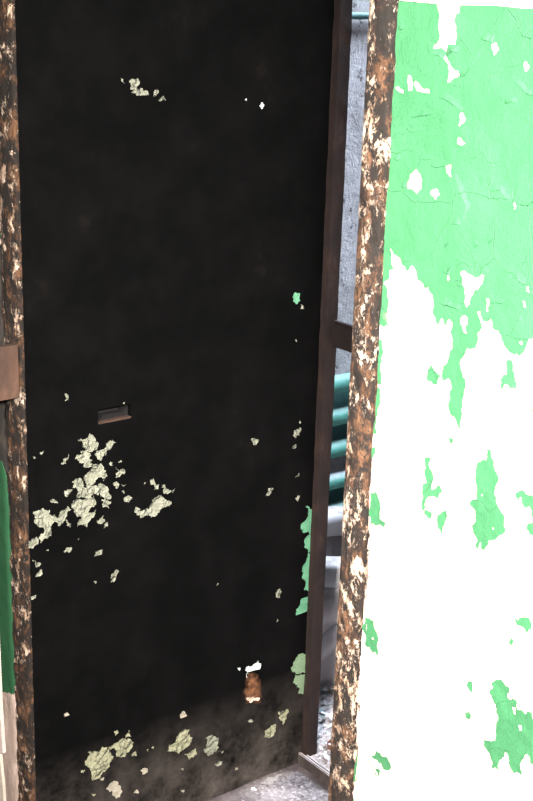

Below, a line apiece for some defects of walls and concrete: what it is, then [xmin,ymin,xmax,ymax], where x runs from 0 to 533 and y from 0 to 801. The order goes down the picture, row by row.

peeling [379,1,533,429]
peeling [373,339,384,434]
peeling [28,434,175,552]
peeling [369,491,386,527]
peeling [421,457,447,534]
peeling [469,449,506,550]
peeling [515,490,533,535]
peeling [513,616,532,633]
peeling [81,730,137,798]
peeling [167,729,224,766]
peeling [264,709,289,738]
peeling [483,679,533,775]